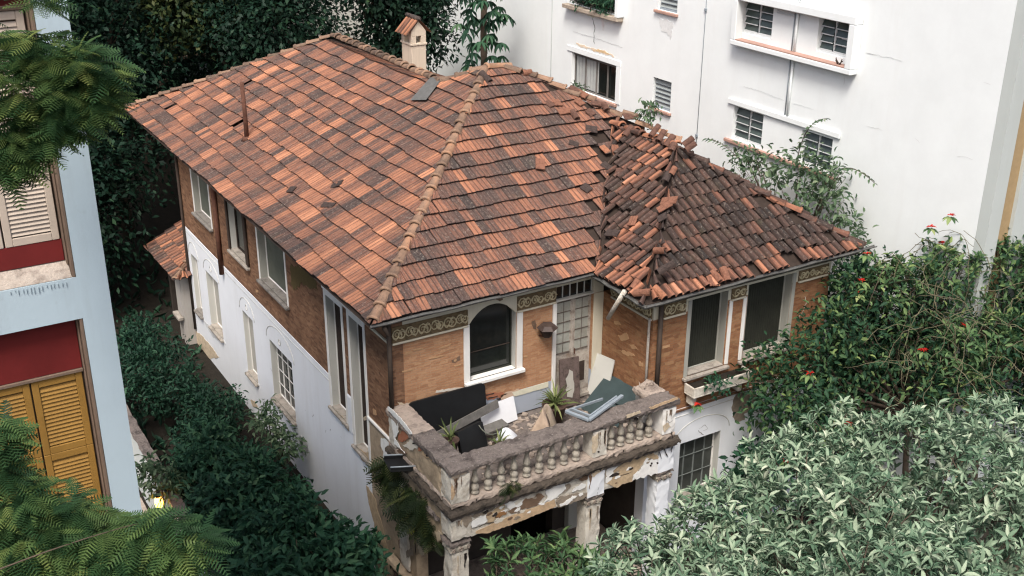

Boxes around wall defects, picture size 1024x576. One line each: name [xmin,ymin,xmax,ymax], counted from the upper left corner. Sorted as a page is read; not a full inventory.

peeling [373,406,427,458]
spalling [605,453,672,488]
spalling [471,483,587,534]